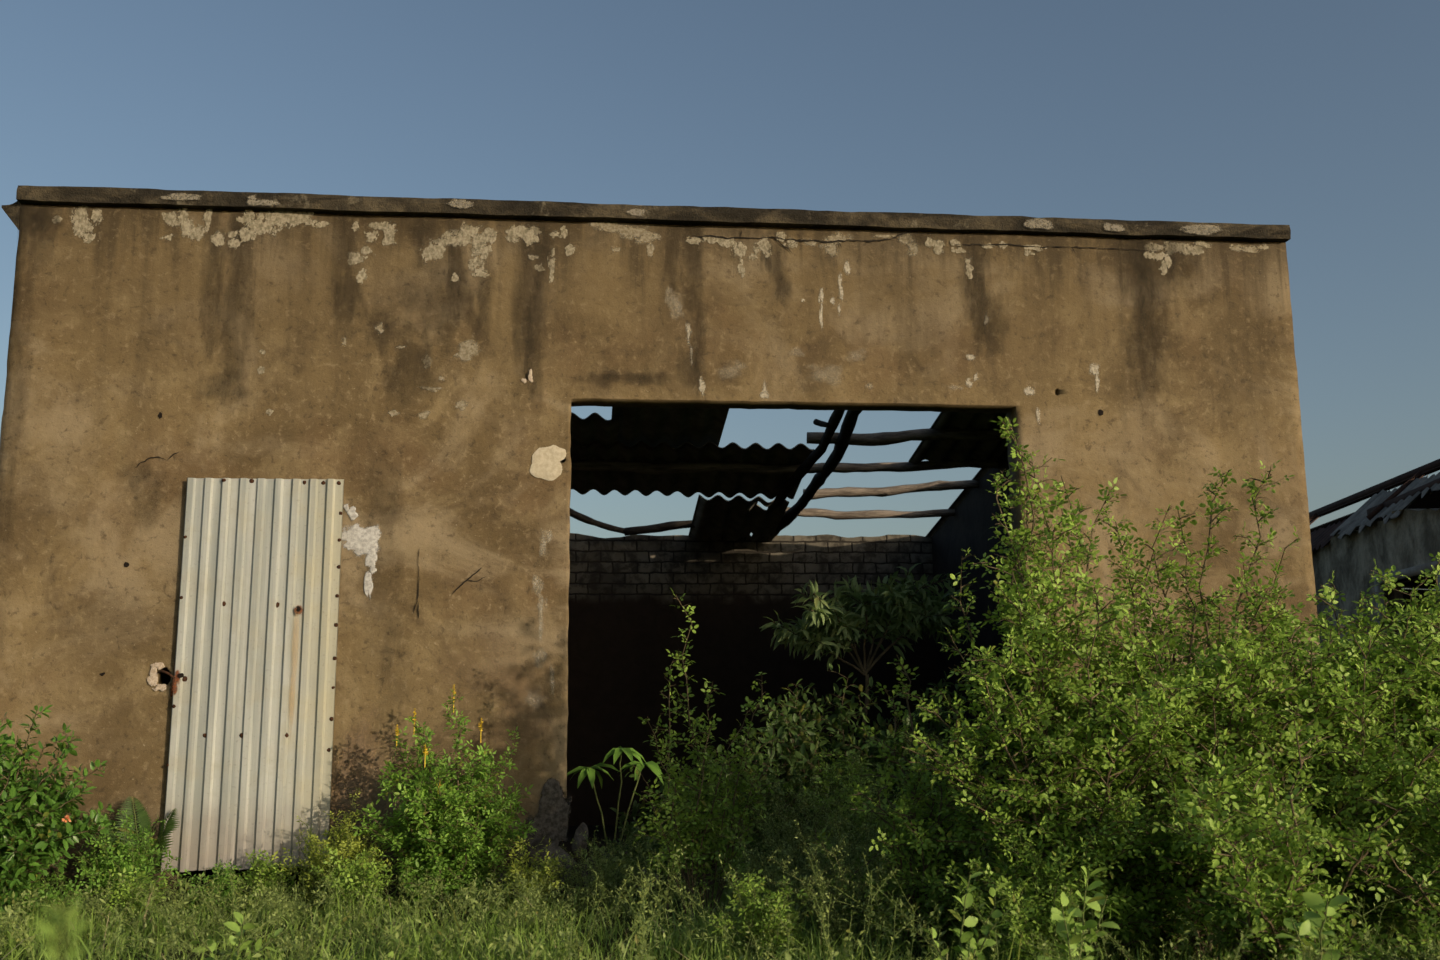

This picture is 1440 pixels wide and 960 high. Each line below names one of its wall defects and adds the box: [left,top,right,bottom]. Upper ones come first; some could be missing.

flaking render [52,205,104,243]
flaking render [159,208,330,249]
flaking render [347,221,398,284]
flaking render [419,221,575,283]
flaking render [686,231,851,278]
flaking render [876,234,1047,279]
flaking render [1143,240,1269,275]
leakage [801,262,850,328]
flaking render [455,340,478,362]
leakage [687,325,705,394]
leakage [1090,364,1100,392]
flaking render [147,662,166,692]